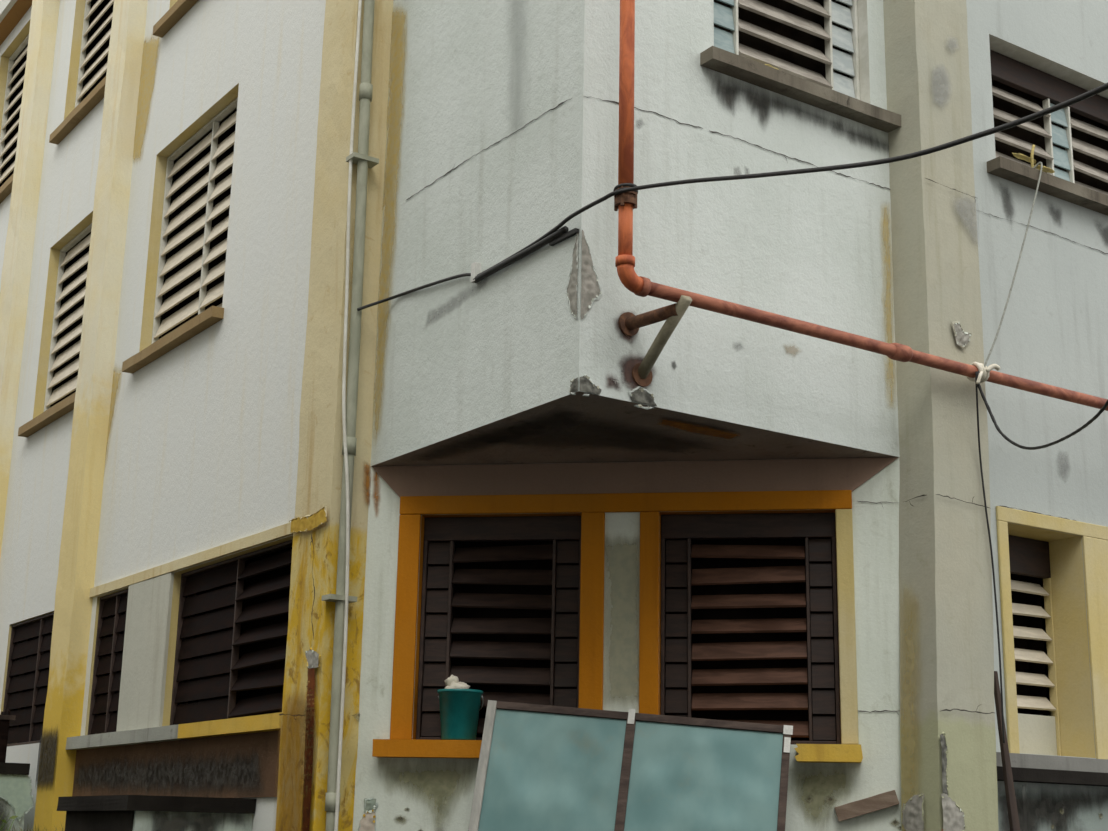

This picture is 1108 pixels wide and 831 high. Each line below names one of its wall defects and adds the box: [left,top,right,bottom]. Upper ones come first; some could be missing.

leakage [717,79,886,148]
crack [405,96,890,201]
spalling [566,230,602,319]
corrosion [883,209,892,344]
spalling [569,374,601,396]
corrosion [608,356,653,389]
spalling [629,386,657,409]
crack [858,494,1076,521]
crack [941,704,994,714]
spalling [938,731,966,831]
leakage [153,811,243,831]
leakage [1003,786,1108,831]